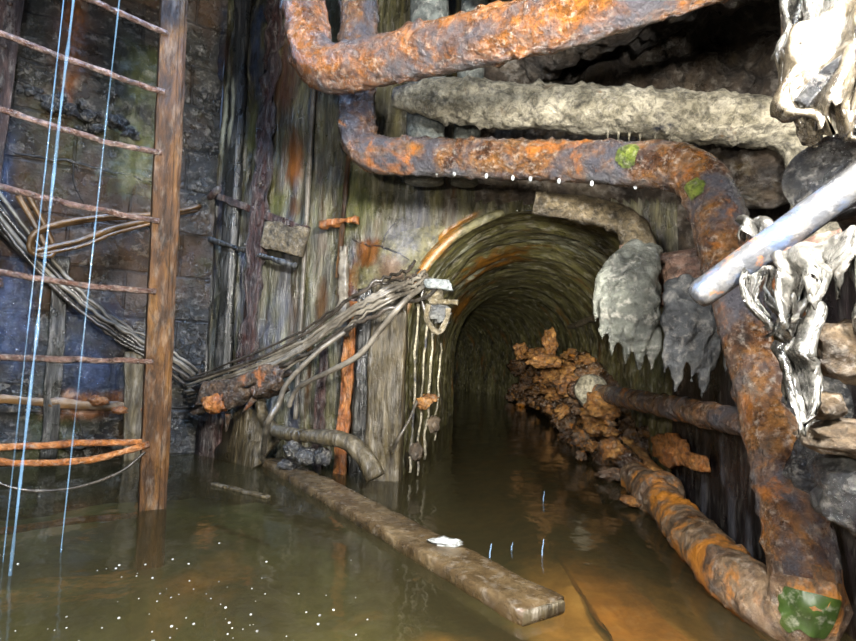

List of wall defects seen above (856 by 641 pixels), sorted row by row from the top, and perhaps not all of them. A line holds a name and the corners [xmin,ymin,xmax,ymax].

rust [410,213,476,290]
rust [450,249,527,325]
rust [307,274,357,433]
rust [332,447,347,486]
rust [618,494,641,507]
rust [650,433,711,472]